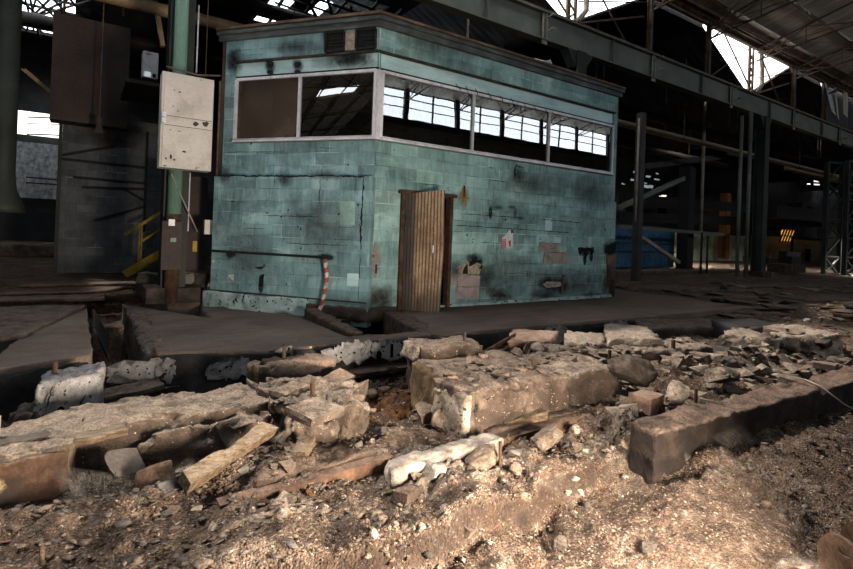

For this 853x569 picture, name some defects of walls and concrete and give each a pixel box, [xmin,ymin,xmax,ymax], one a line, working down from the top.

crack [220,147,369,301]
peeling [106,357,176,384]
peeling [205,356,250,380]